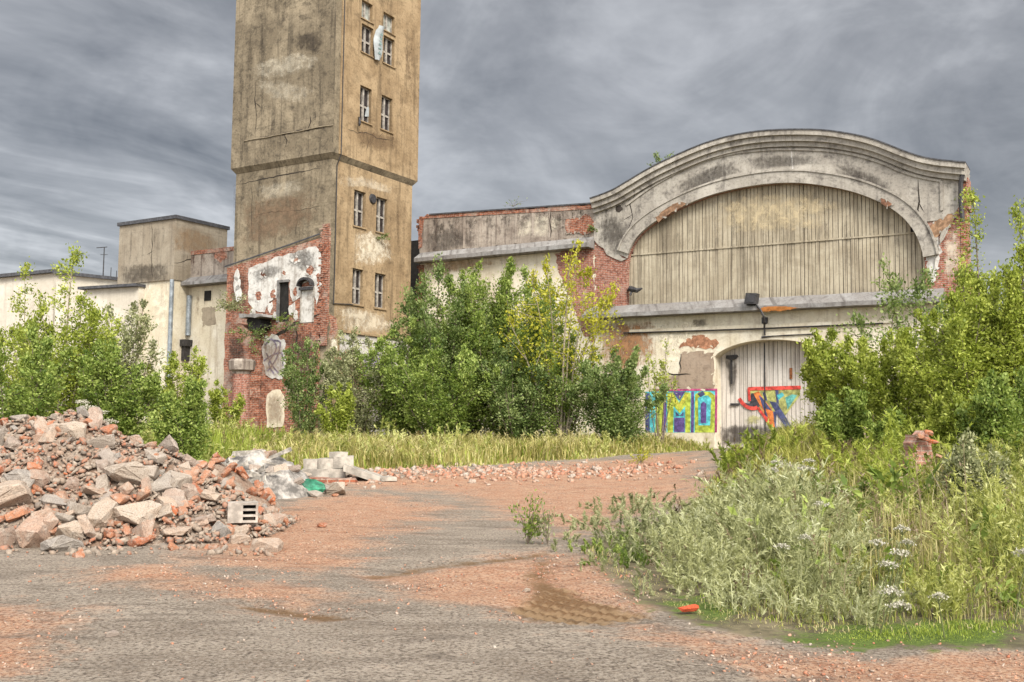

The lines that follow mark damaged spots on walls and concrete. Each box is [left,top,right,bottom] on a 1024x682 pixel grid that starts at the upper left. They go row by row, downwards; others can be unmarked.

crack [254,88,322,147]
peeling [233,246,322,321]
spalling [553,213,597,342]
spalling [653,199,688,223]
spalling [926,210,959,282]
peeling [262,334,286,428]
spalling [659,333,719,391]